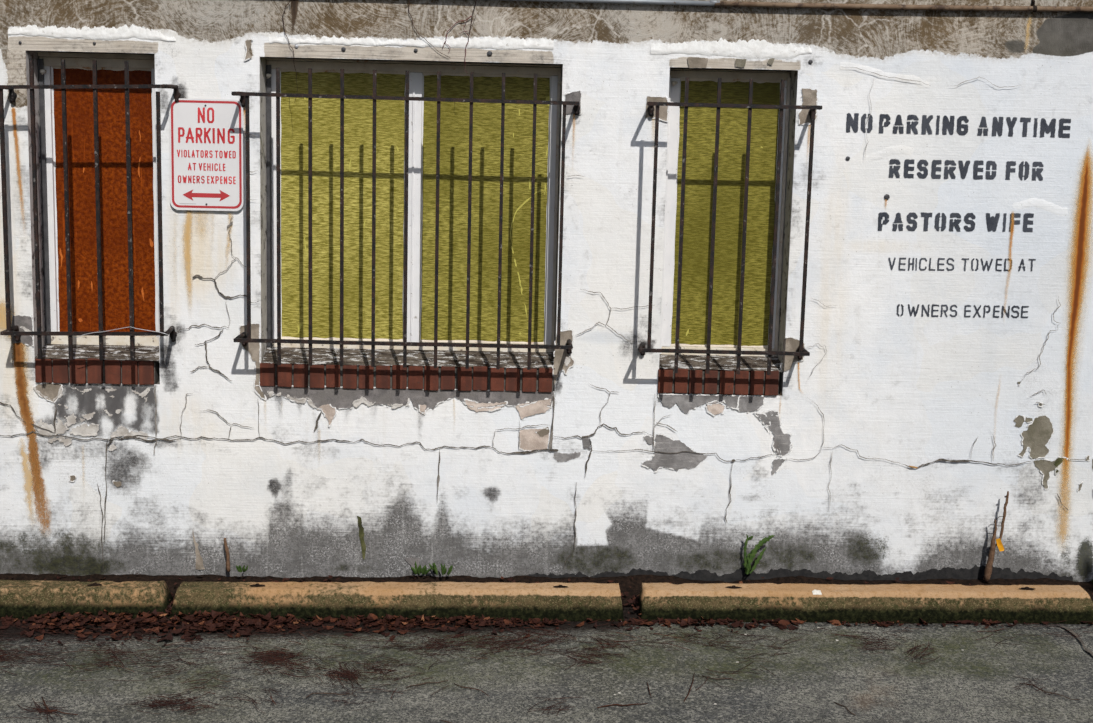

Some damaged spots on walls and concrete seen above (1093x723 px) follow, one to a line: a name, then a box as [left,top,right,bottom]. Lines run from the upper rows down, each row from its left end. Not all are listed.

flaking render [687,57,708,68]
corrosion [0,304,12,329]
corrosion [13,342,50,529]
peeling [33,383,148,451]
damp [111,452,138,482]
flaking render [239,323,591,462]
crack [0,199,1030,570]
flaking render [641,434,708,473]
flaking render [657,393,793,474]
spalling [1013,402,1068,490]
corrosion [1060,153,1093,537]
damp [528,564,1073,582]